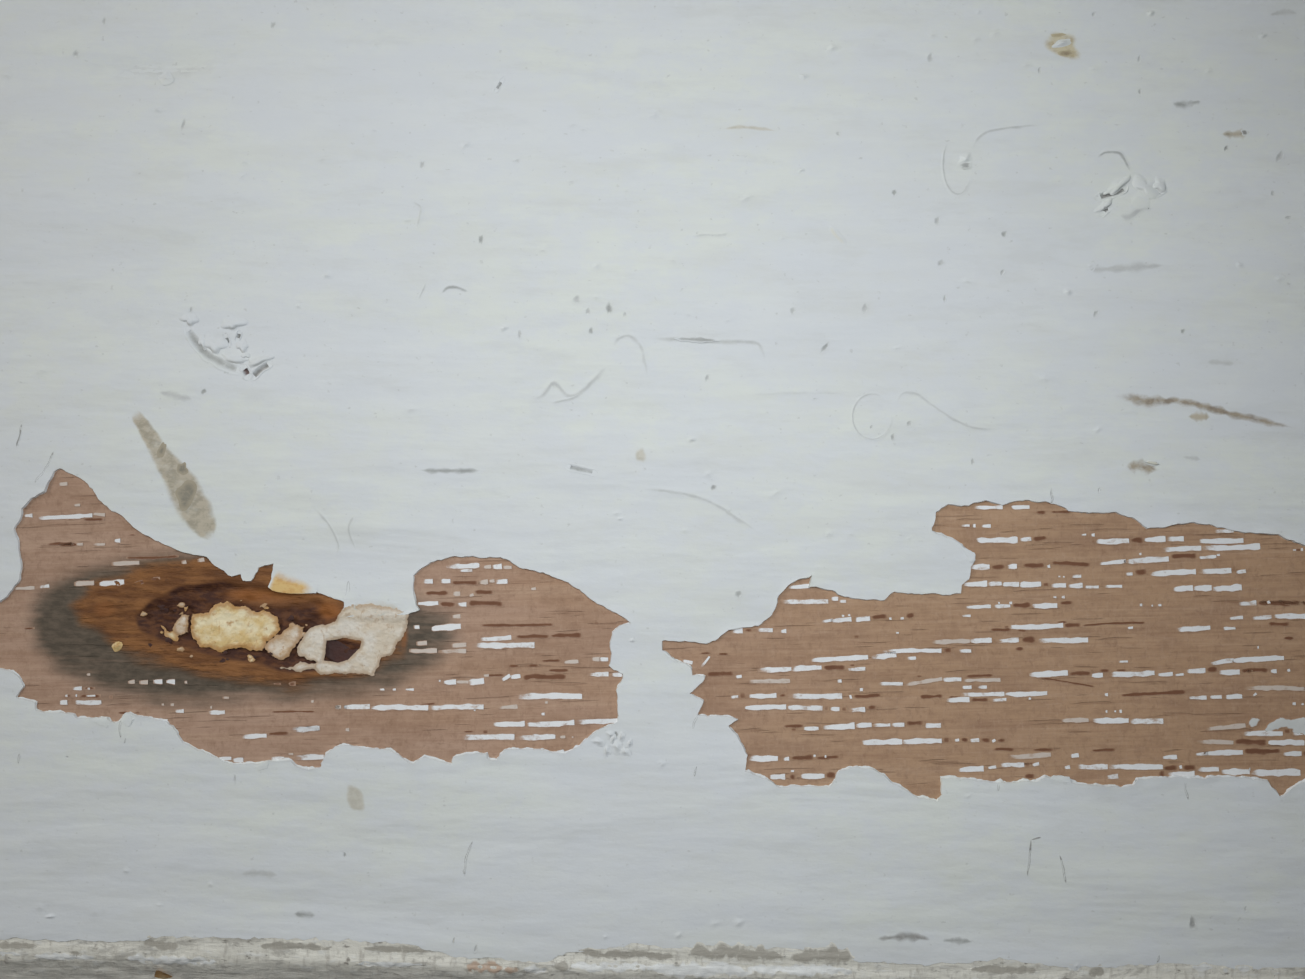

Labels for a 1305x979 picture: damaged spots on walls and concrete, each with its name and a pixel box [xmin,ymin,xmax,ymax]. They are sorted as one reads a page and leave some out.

peeling [0,469,632,771]
peeling [662,501,1305,800]